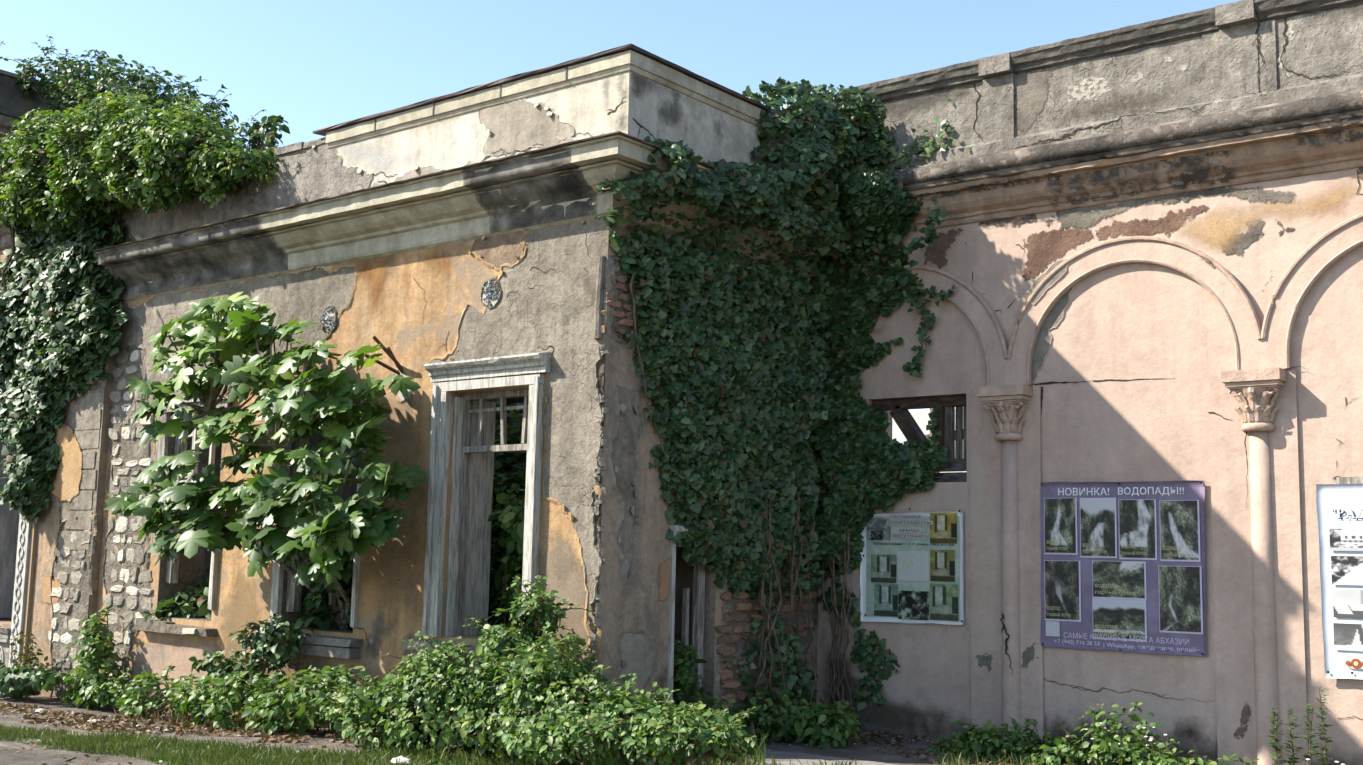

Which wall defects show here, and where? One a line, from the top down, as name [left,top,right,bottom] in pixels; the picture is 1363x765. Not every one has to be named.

crack [1256,17,1363,85]
spalling [465,98,589,166]
crack [973,83,983,141]
crack [1015,102,1213,149]
flaking render [118,143,441,243]
water stain [464,146,596,233]
peeling [924,229,963,269]
peeling [979,186,1295,386]
flaking render [41,264,359,707]
flaking render [429,216,646,689]